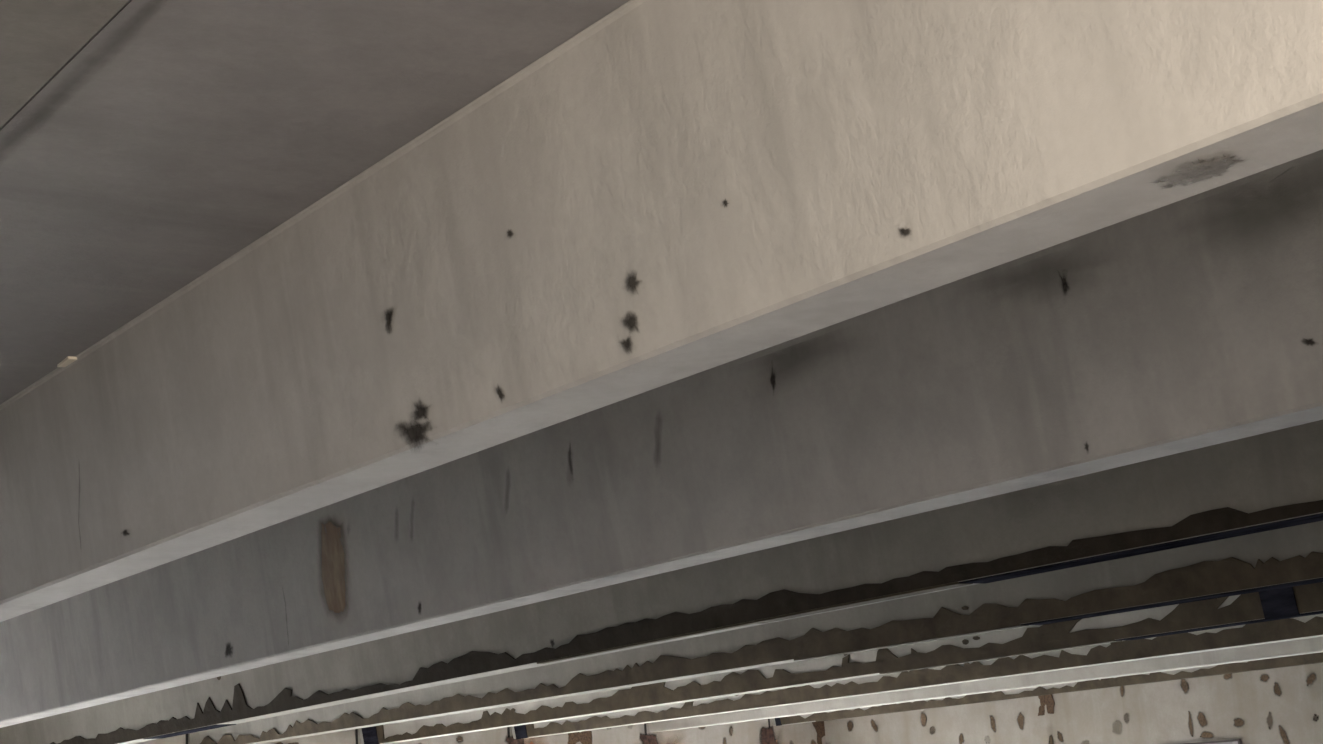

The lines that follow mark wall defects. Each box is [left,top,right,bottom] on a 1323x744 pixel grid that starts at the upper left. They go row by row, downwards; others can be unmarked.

spalling [1158,156,1243,188]
corrosion [321,520,346,615]
corrosion [640,733,662,744]